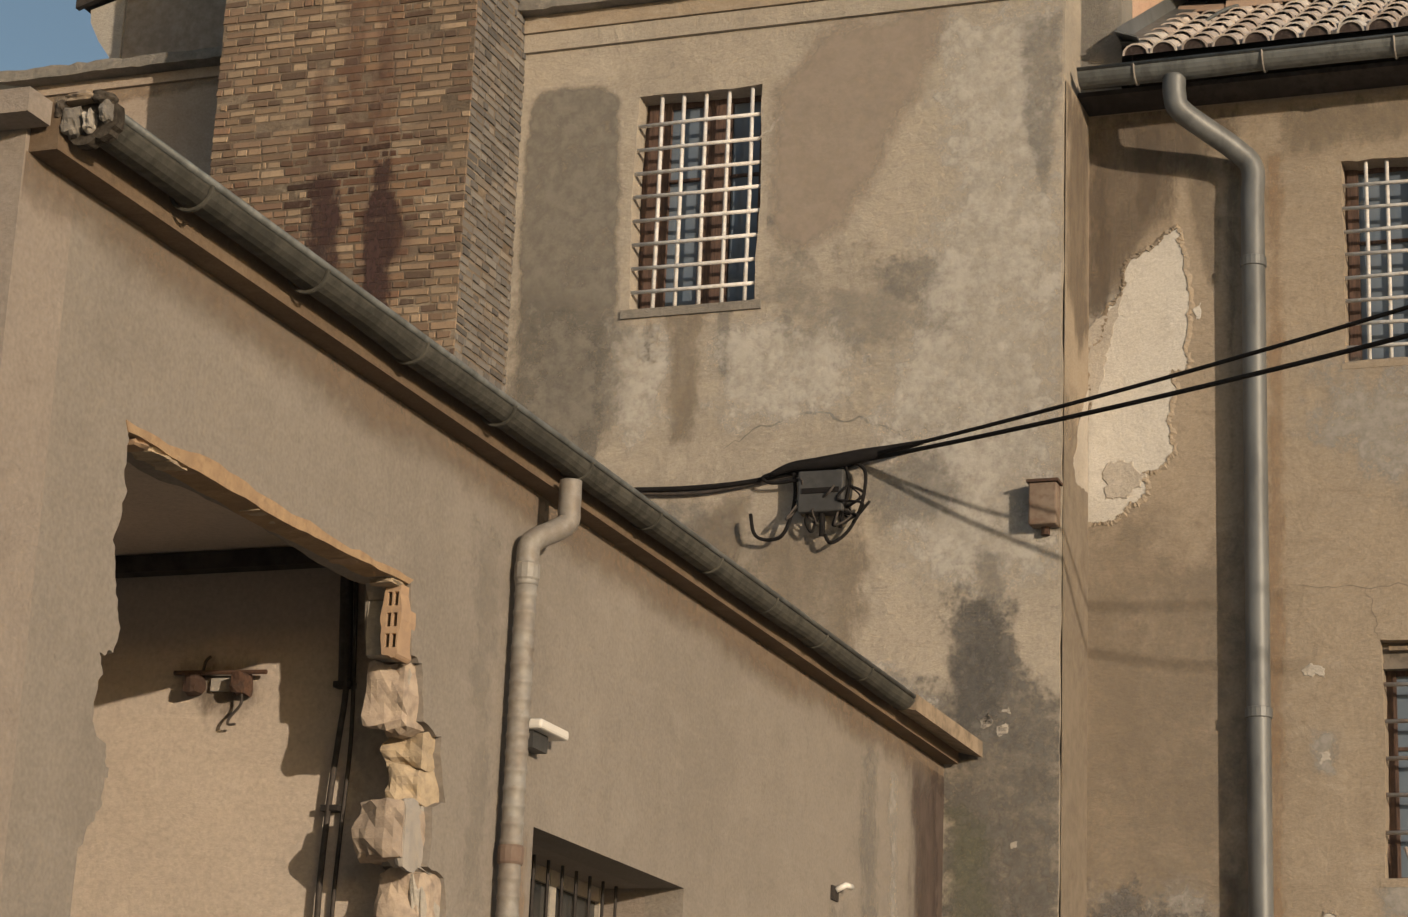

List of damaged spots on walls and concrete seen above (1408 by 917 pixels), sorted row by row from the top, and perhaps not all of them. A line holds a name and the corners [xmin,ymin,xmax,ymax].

water stain [508,87,625,457]
flaking render [1073,224,1201,528]
spalling [126,420,441,917]
water stain [889,396,1211,917]
flaking render [1301,663,1325,678]